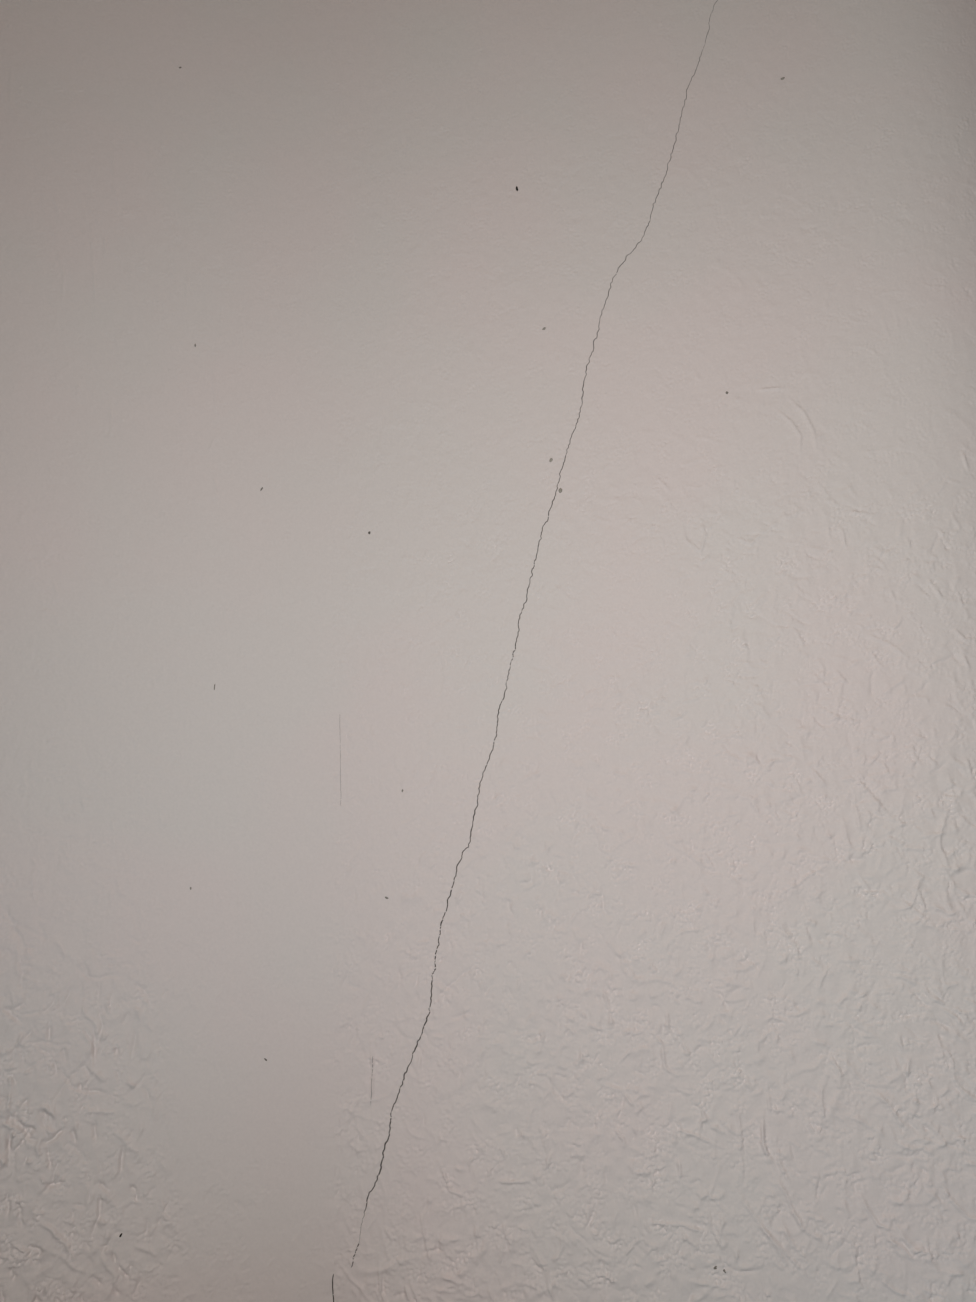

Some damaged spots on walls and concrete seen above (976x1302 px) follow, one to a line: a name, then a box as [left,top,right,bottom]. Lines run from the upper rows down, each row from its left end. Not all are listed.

crack [332,1,717,1302]